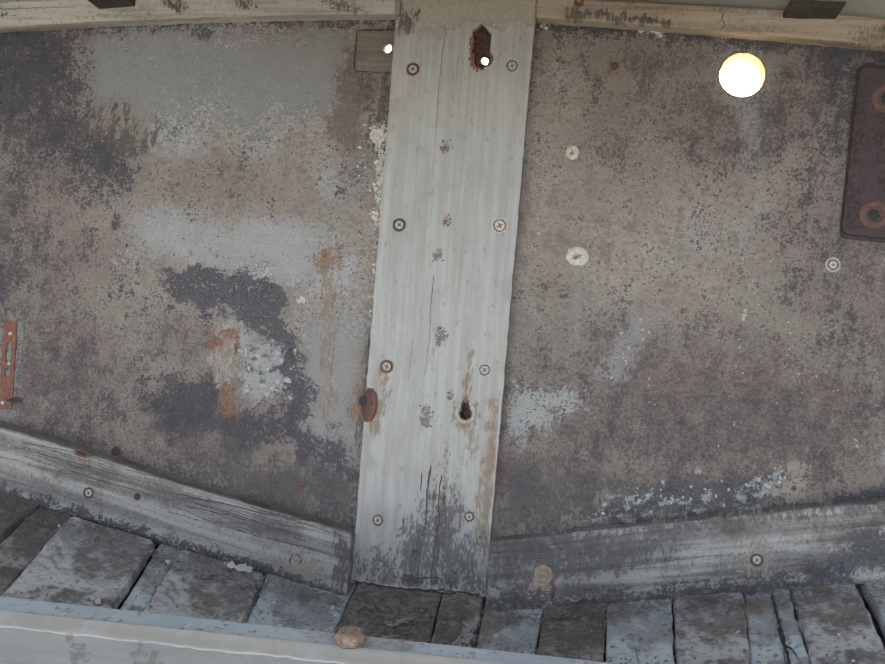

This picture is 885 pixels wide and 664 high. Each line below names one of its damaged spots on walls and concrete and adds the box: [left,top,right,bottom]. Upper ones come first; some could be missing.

leakage [0,0,421,199]
rust [0,320,22,410]
rust [203,318,257,419]
leakage [0,334,885,624]